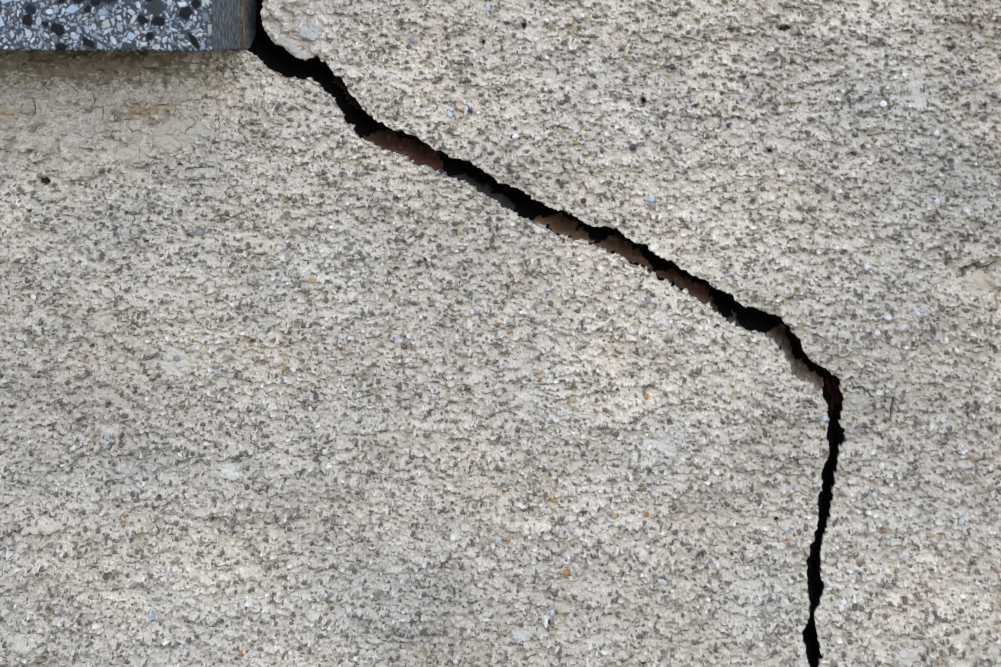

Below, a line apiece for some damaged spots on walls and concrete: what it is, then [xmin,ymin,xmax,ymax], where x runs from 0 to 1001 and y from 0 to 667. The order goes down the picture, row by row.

crack [247,0,844,667]